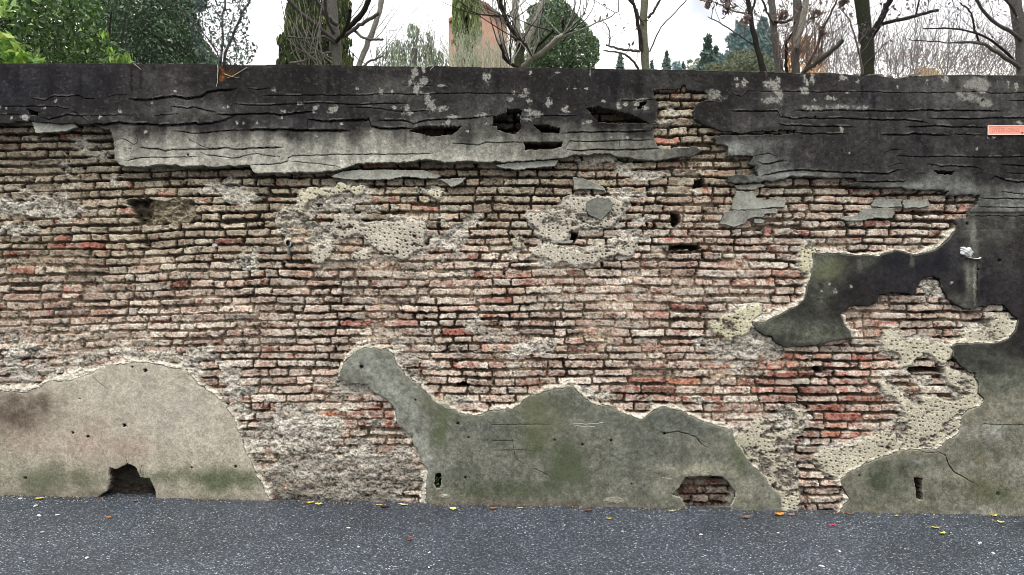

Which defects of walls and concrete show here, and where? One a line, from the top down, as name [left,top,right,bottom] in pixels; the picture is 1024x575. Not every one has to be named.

crack [1,67,659,169]
crack [704,90,1024,217]
flaking render [0,86,1017,512]